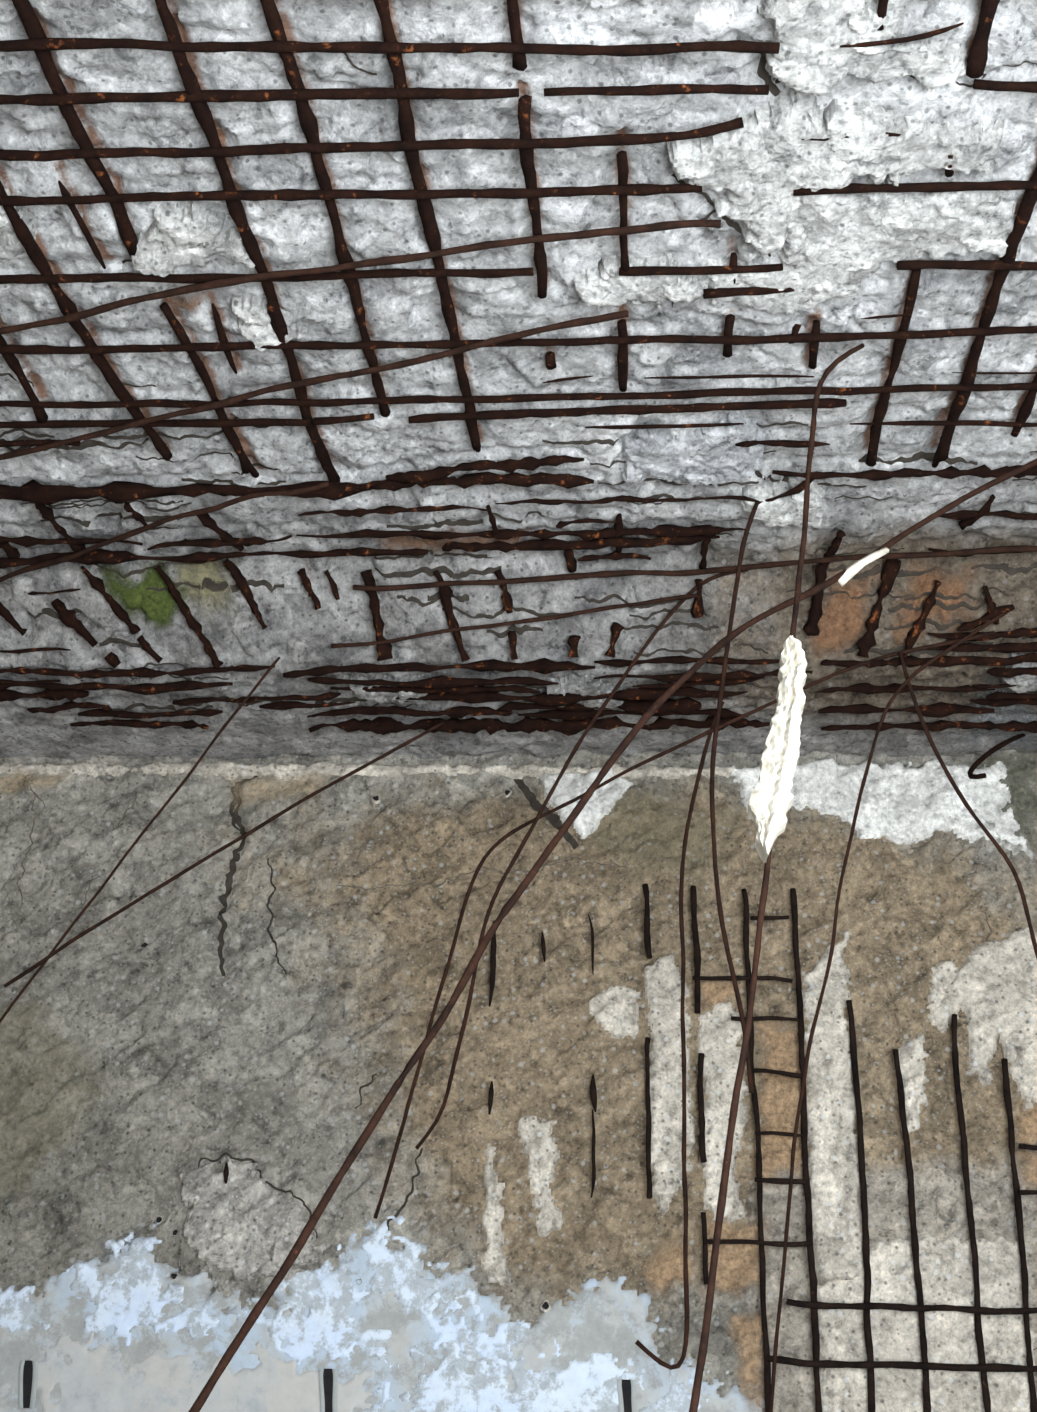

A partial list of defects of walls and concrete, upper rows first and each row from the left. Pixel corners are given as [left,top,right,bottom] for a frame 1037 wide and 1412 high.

spalling [0,0,1021,460]
corrosion [815,587,864,647]
crack [217,776,287,976]
peeling [0,343,1037,1412]